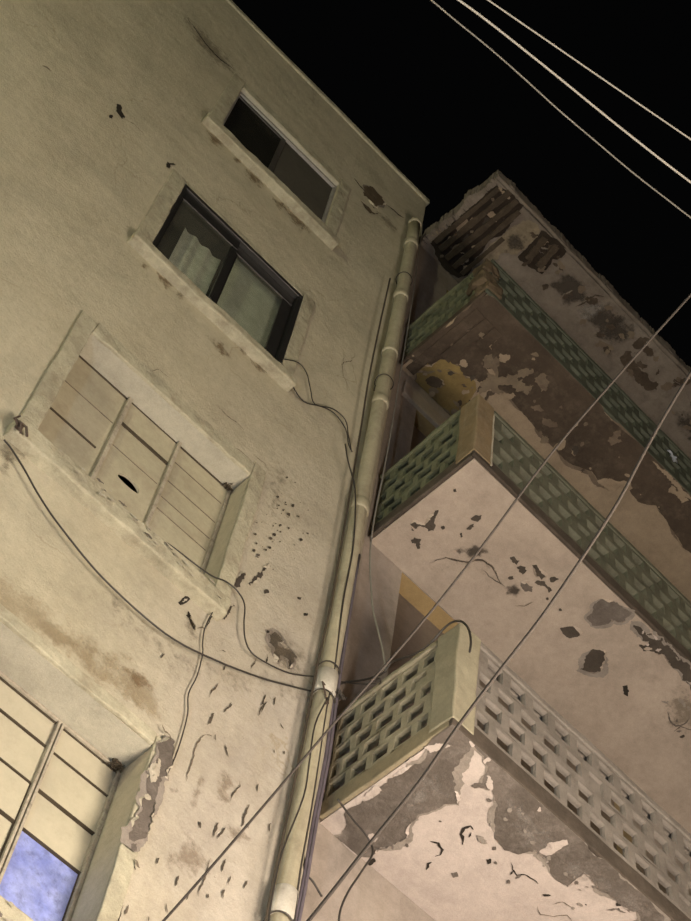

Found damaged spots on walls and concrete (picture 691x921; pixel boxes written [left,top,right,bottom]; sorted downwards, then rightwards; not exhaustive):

spalling [354,178,402,217]
spalling [421,173,567,278]
damp [522,232,691,391]
peeling [403,295,691,553]
spalling [234,563,271,594]
crack [434,557,504,586]
spalling [507,556,559,600]
spalling [120,725,175,870]
spalling [213,805,249,839]
crack [426,825,473,878]
peeling [334,724,671,921]
crack [487,859,572,921]